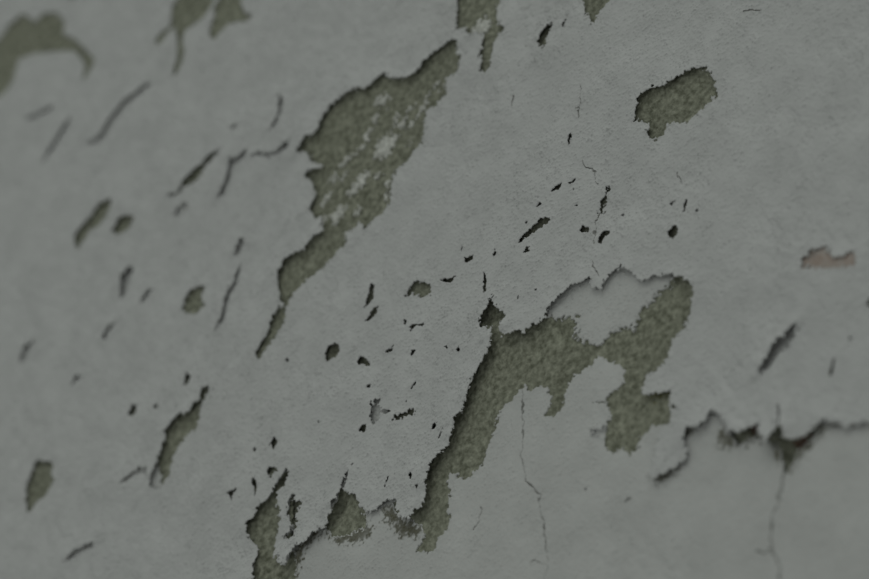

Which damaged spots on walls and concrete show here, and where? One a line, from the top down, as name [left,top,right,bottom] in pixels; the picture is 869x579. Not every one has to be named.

peeling [0,5,100,98]
peeling [150,0,257,81]
peeling [575,0,625,32]
peeling [627,57,728,147]
peeling [243,0,512,321]
peeling [179,277,208,321]
peeling [240,256,869,579]
peeling [19,454,58,517]
crack [520,391,548,574]